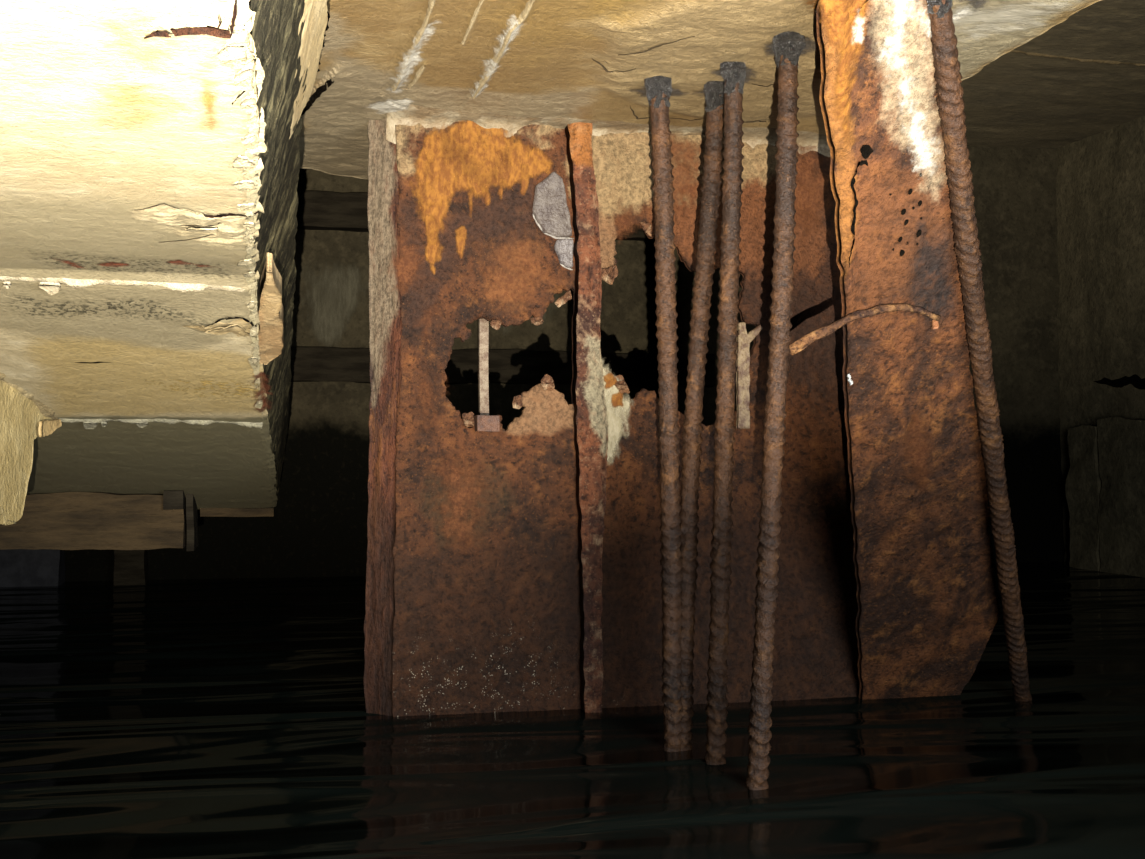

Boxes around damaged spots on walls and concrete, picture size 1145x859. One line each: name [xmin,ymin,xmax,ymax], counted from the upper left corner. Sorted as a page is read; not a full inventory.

peeling [21,24,283,419]
crack [144,0,237,39]
leakage [370,27,434,114]
corrosion [396,120,551,283]
leakage [472,16,522,98]
corrosion [670,137,705,209]
corrosion [807,0,867,133]
leakage [882,0,912,69]
leakage [900,82,932,169]
spalling [644,62,746,765]
spalling [746,31,806,790]
spalling [926,0,1032,702]